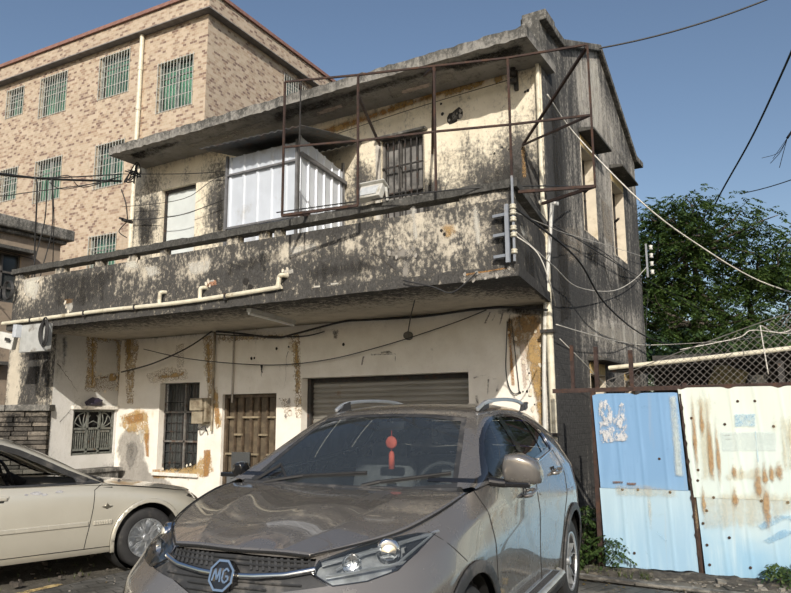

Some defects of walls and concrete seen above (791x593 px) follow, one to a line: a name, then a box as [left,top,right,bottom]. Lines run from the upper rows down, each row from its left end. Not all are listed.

damp [324,97,427,132]
damp [580,59,624,156]
damp [189,260,210,274]
damp [587,320,642,350]
peeling [85,337,139,403]
peeling [507,314,547,423]
peeling [598,400,628,443]
rust [692,409,721,475]
rust [755,466,782,523]